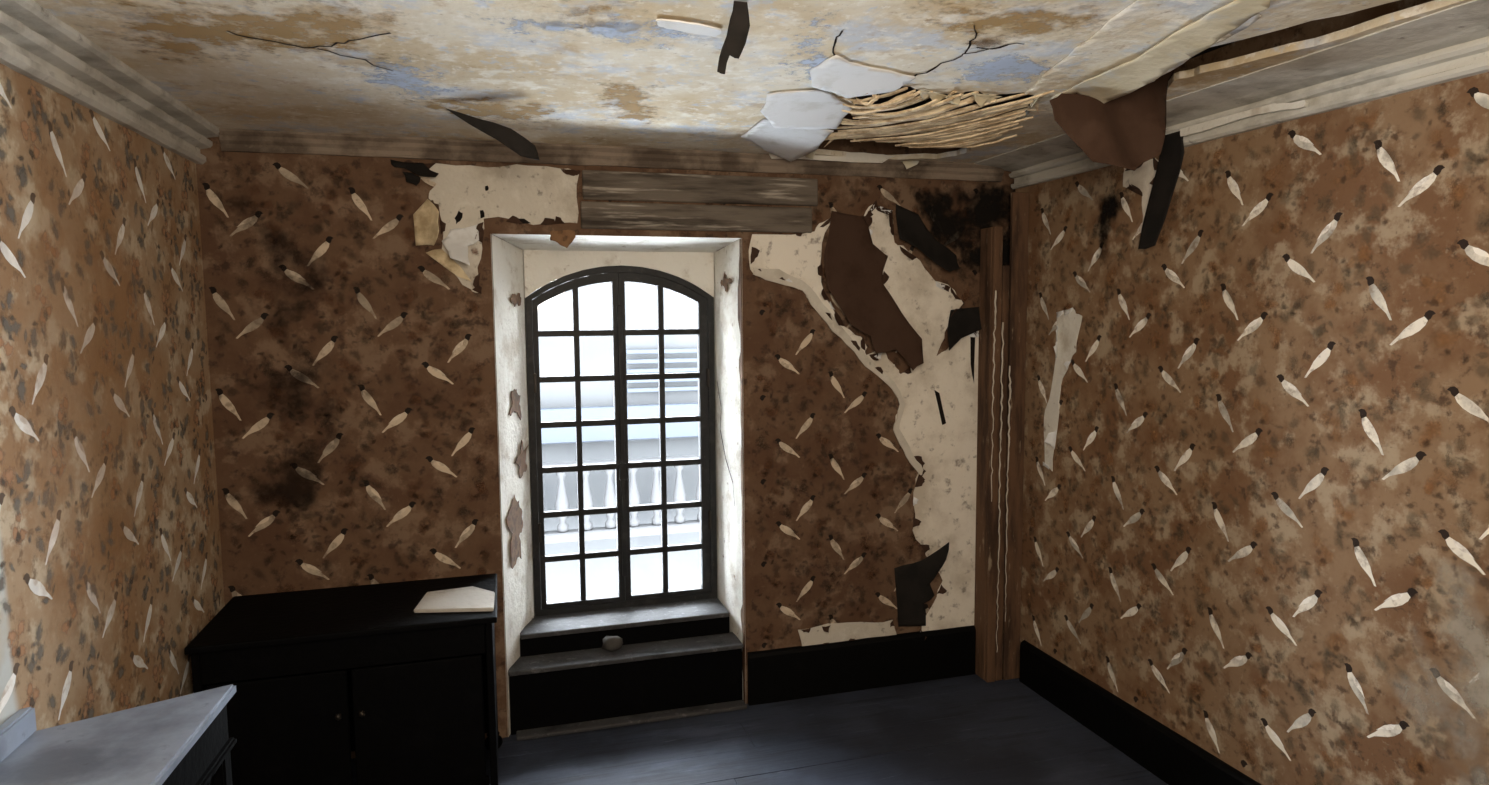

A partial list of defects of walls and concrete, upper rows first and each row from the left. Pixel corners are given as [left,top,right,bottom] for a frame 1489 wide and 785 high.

water stain [119,1,363,61]
crack [914,25,1024,76]
water stain [427,98,554,120]
peeling [741,21,1049,169]
peeling [475,222,484,243]
peeling [506,216,576,248]
peeling [863,200,917,260]
peeling [818,264,883,374]
spalling [969,331,979,381]
spalling [934,390,946,425]
peeling [1043,430,1057,469]
peeling [913,456,926,527]